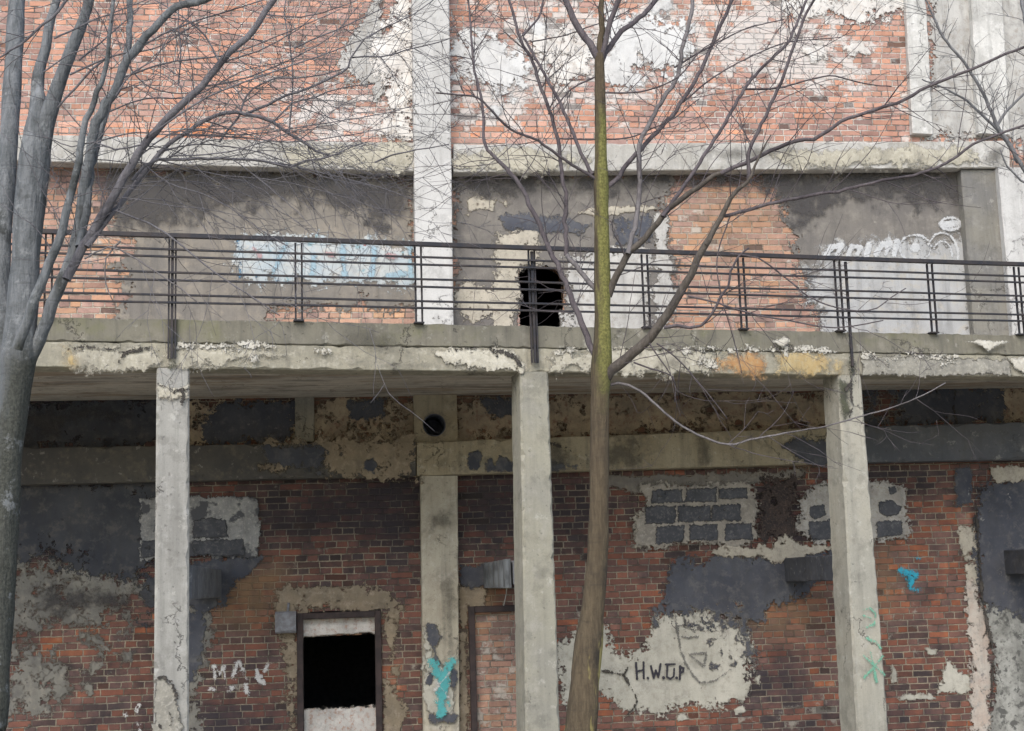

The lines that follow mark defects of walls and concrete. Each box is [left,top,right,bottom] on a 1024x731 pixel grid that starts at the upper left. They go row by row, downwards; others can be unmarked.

peeling [649,0,675,14]
peeling [525,17,549,36]
peeling [801,40,872,64]
flaking render [63,342,285,373]
flaking render [431,346,526,374]
flaking render [545,345,592,379]
flaking render [612,346,715,381]
peeling [198,398,295,445]
peeling [346,396,388,421]
peeling [467,450,513,473]
spalling [151,678,184,731]
peeling [382,665,410,731]